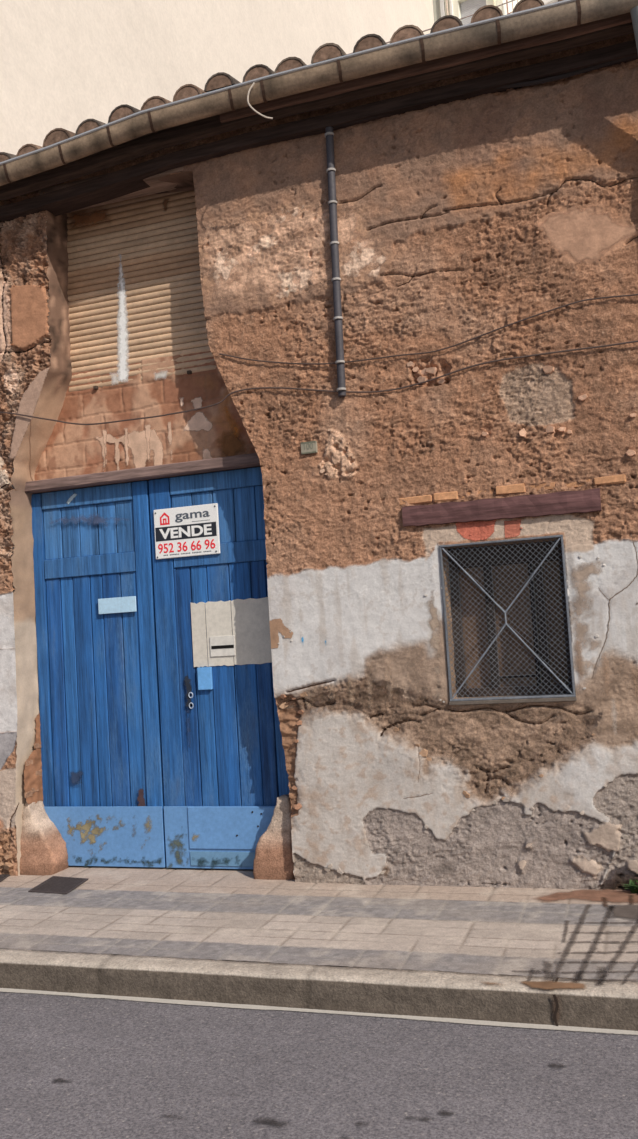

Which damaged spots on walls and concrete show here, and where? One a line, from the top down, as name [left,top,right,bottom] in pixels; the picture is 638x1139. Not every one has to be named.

crack [369,177,638,230]
peeling [180,397,212,431]
crack [592,534,638,678]
flaking render [276,594,638,890]
crack [370,704,591,799]